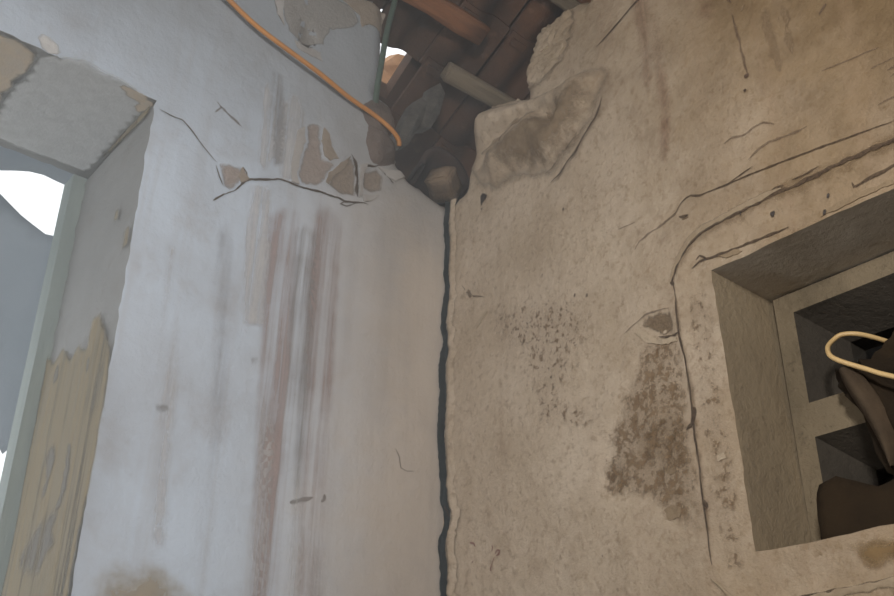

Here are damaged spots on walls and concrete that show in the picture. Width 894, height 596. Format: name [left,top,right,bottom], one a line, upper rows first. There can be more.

peeling [275,0,385,61]
crack [596,0,638,47]
peeling [0,35,33,96]
spalling [381,54,404,84]
peeling [108,85,153,151]
spalling [221,165,249,188]
crack [162,110,367,206]
spalling [290,124,405,202]
crack [664,96,894,596]
peeling [1,315,109,596]